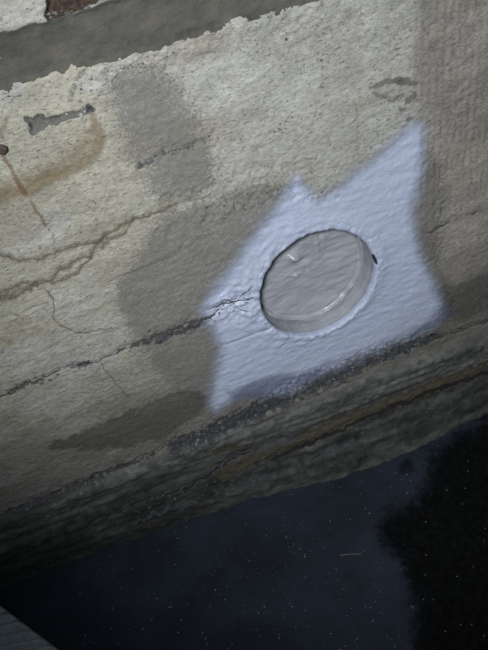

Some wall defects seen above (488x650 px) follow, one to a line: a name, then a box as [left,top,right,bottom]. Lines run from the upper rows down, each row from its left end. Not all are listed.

peeling [75,56,147,91]
peeling [154,45,184,60]
damp [106,66,216,201]
crack [58,205,173,276]
crack [0,287,253,398]
damp [116,182,291,406]